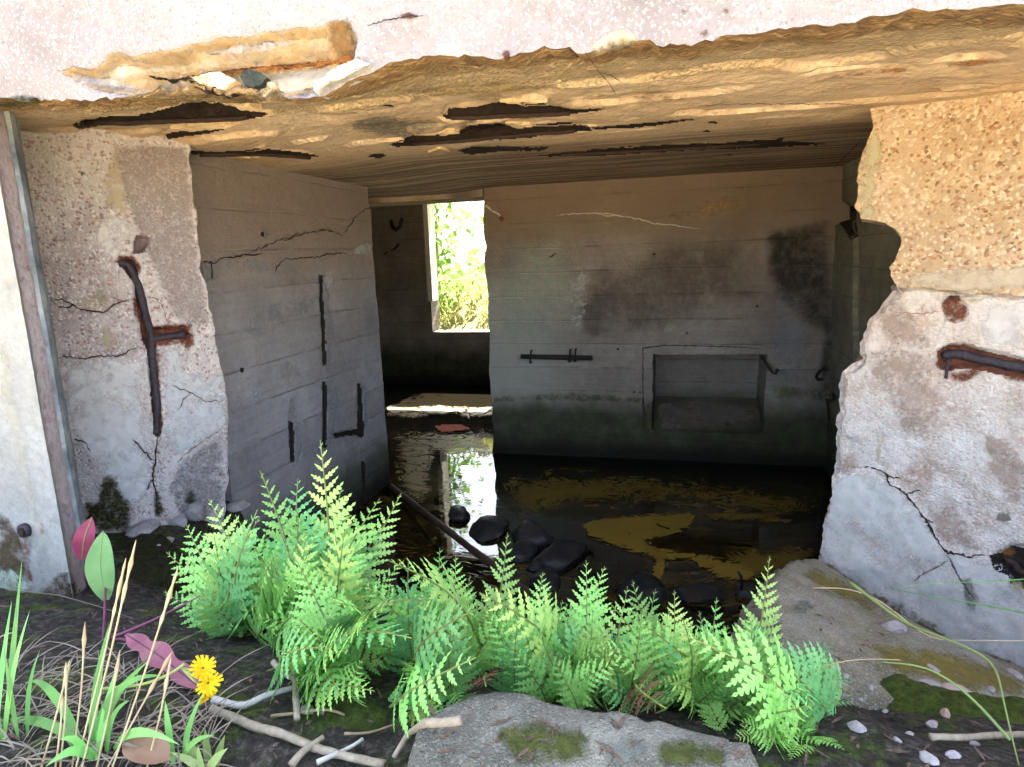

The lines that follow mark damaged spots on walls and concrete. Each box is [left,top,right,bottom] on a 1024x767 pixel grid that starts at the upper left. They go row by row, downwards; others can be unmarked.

spalling [59,20,373,139]
spalling [368,98,826,158]
crack [557,212,700,229]
crack [53,297,167,321]
crack [204,207,370,505]
damp [770,228,832,390]
corrosion [942,296,977,323]
crack [132,431,219,492]
flaking render [824,475,1024,681]
crack [858,466,998,606]